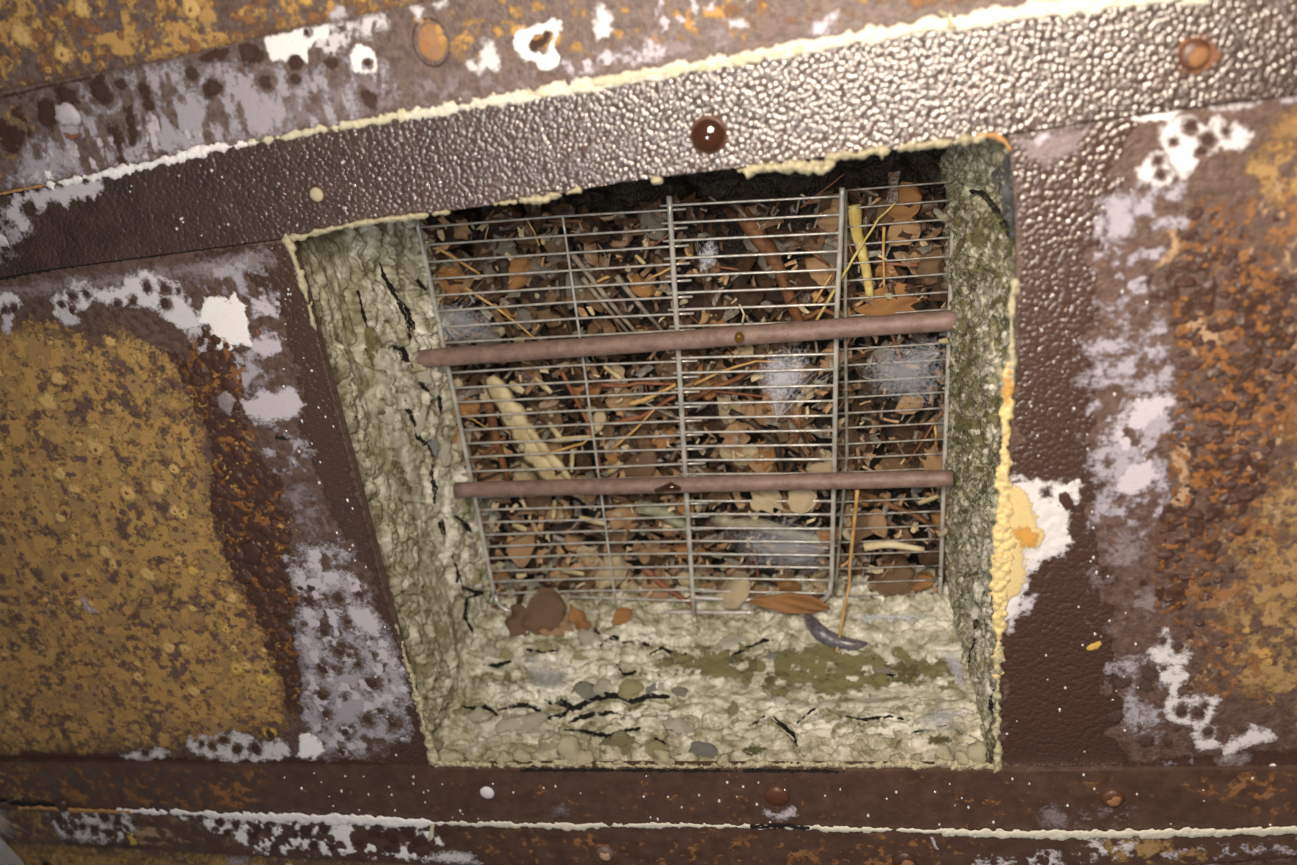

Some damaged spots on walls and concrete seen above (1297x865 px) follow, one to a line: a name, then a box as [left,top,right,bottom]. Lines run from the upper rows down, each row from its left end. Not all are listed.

rust [0,0,407,178]
damp [0,0,751,262]
damp [0,246,412,763]
rust [0,243,432,865]
spalling [464,682,581,743]
rust [369,773,977,865]
spalling [595,689,937,743]
spalling [906,492,995,712]
spalling [970,280,1010,476]
rust [1000,105,1297,825]
damp [1079,101,1260,620]
damp [1105,628,1278,766]